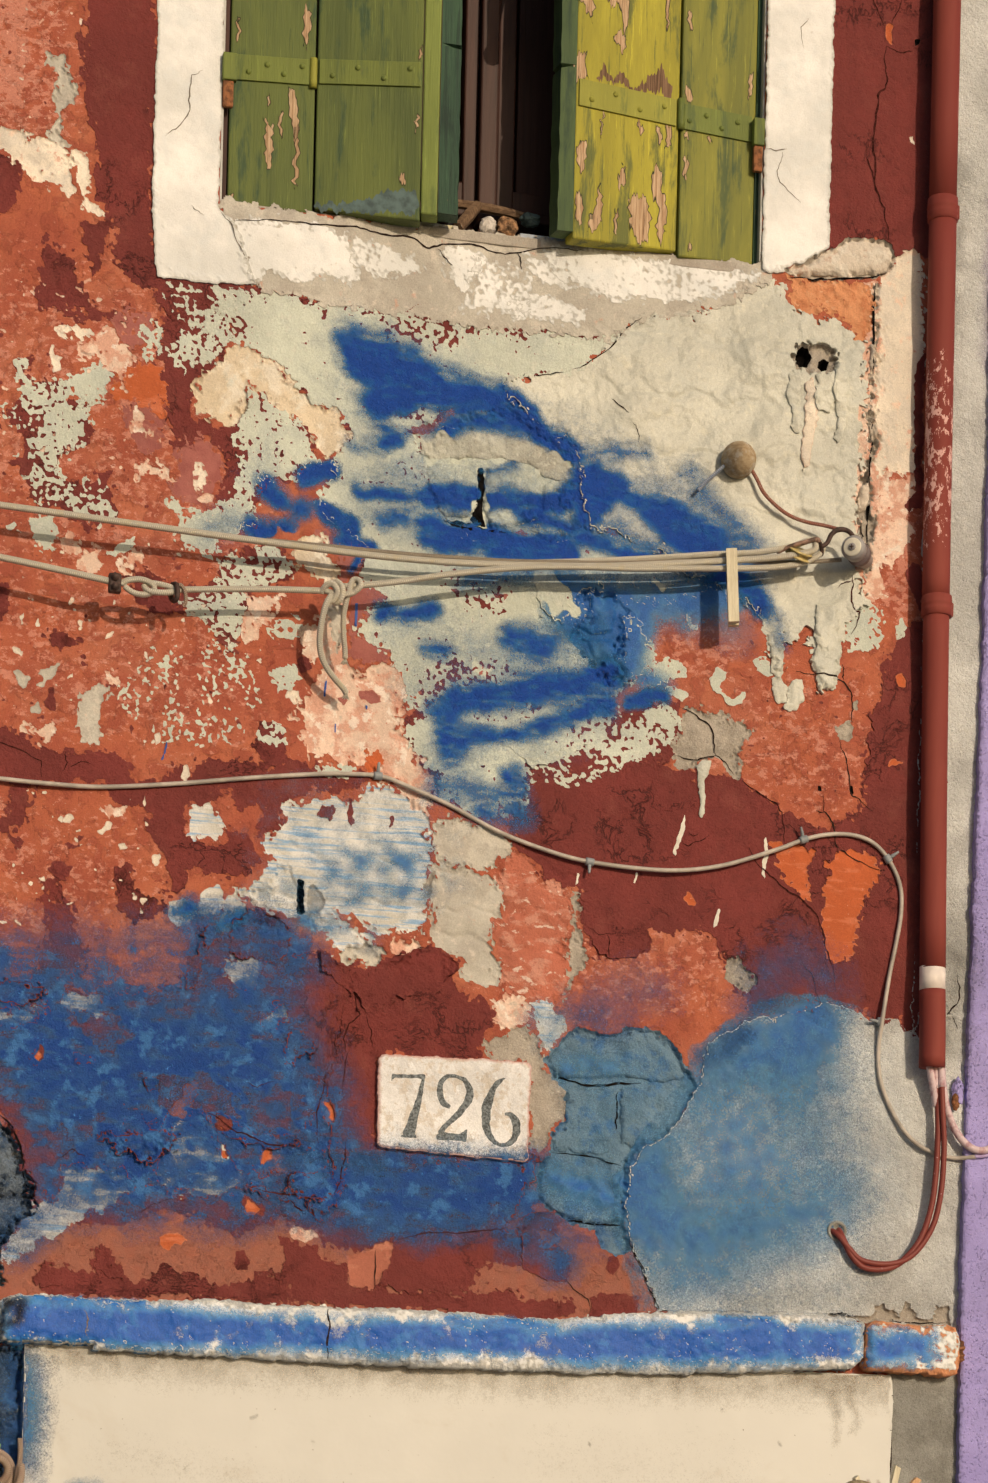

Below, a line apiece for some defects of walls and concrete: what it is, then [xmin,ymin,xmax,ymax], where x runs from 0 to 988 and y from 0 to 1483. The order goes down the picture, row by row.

crack [193,207,581,269]
crack [789,0,912,368]
peeling [784,0,933,653]
peeling [0,570,960,1375]